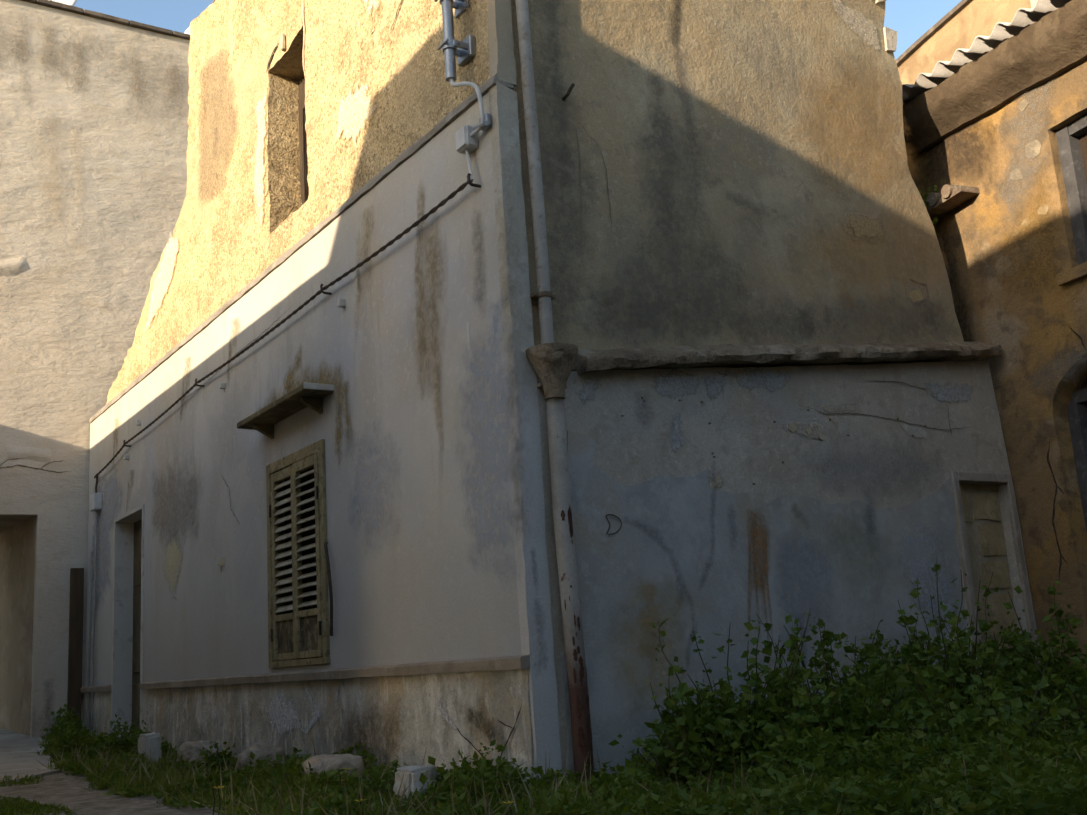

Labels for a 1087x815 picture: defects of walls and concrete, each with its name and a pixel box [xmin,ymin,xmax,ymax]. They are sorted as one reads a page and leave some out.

flaking render [832,0,880,49]
crack [797,380,968,439]
crack [0,458,67,473]
corrosion [561,505,573,537]
corrosion [564,585,593,767]